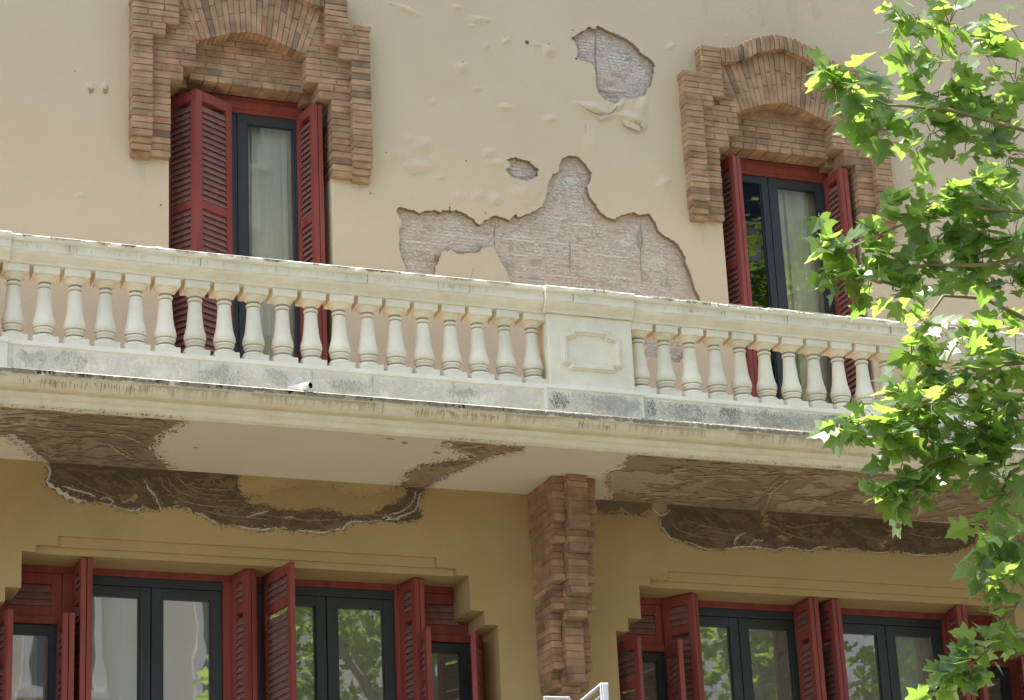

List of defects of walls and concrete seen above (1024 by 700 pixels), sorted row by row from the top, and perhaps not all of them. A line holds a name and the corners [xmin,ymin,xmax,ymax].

spalling [573,26,655,104]
spalling [396,156,701,302]
spalling [644,336,683,362]